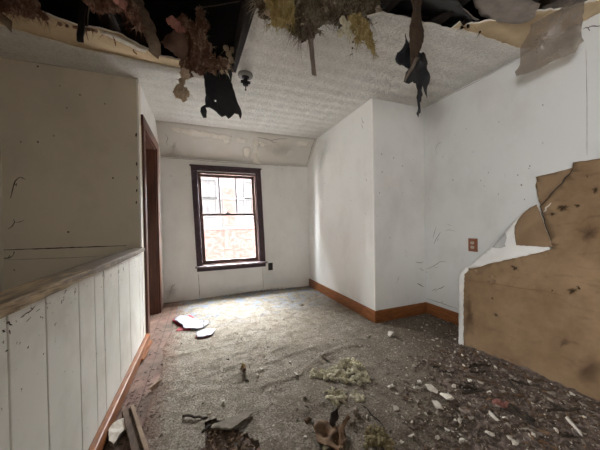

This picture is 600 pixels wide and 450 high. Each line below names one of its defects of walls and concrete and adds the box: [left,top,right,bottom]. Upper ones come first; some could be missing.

spalling [535,168,572,205]